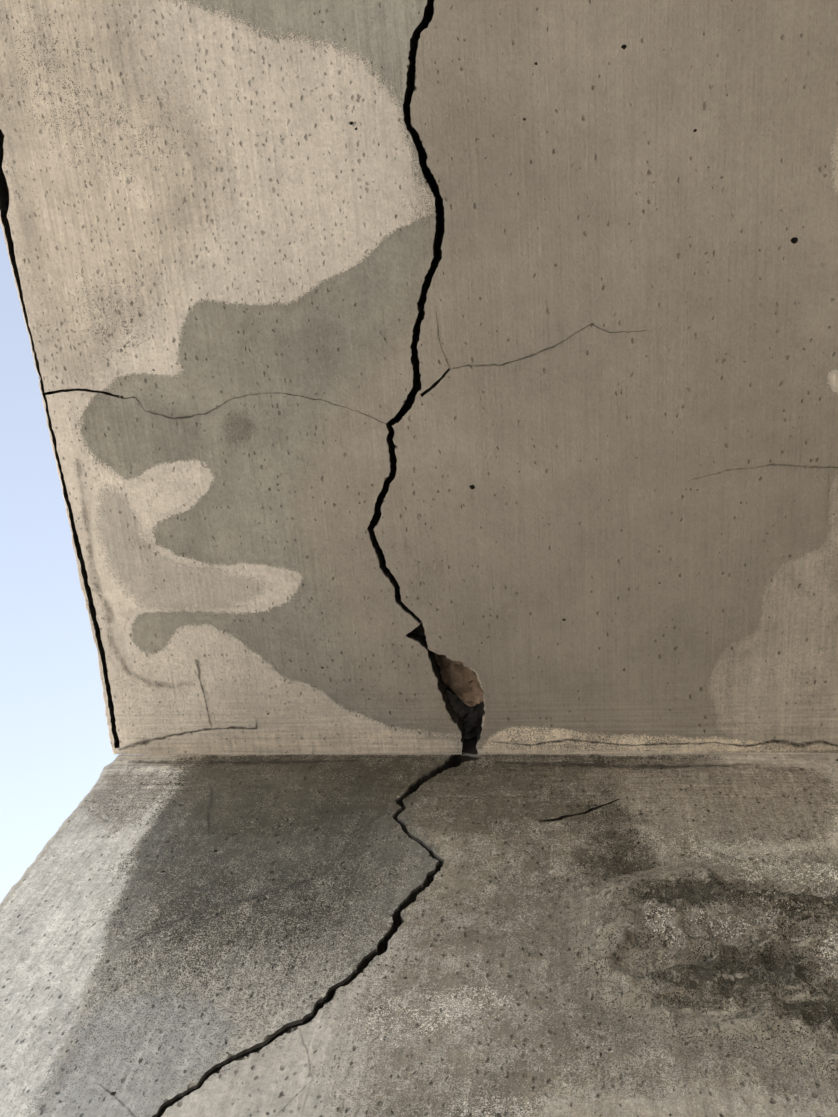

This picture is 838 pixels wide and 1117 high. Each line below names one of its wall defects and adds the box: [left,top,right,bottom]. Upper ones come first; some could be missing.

crack [42,388,247,419]
crack [288,0,640,651]
crack [123,662,349,832]
damp [22,213,838,1117]
spalling [427,648,485,756]
crack [152,739,838,1117]